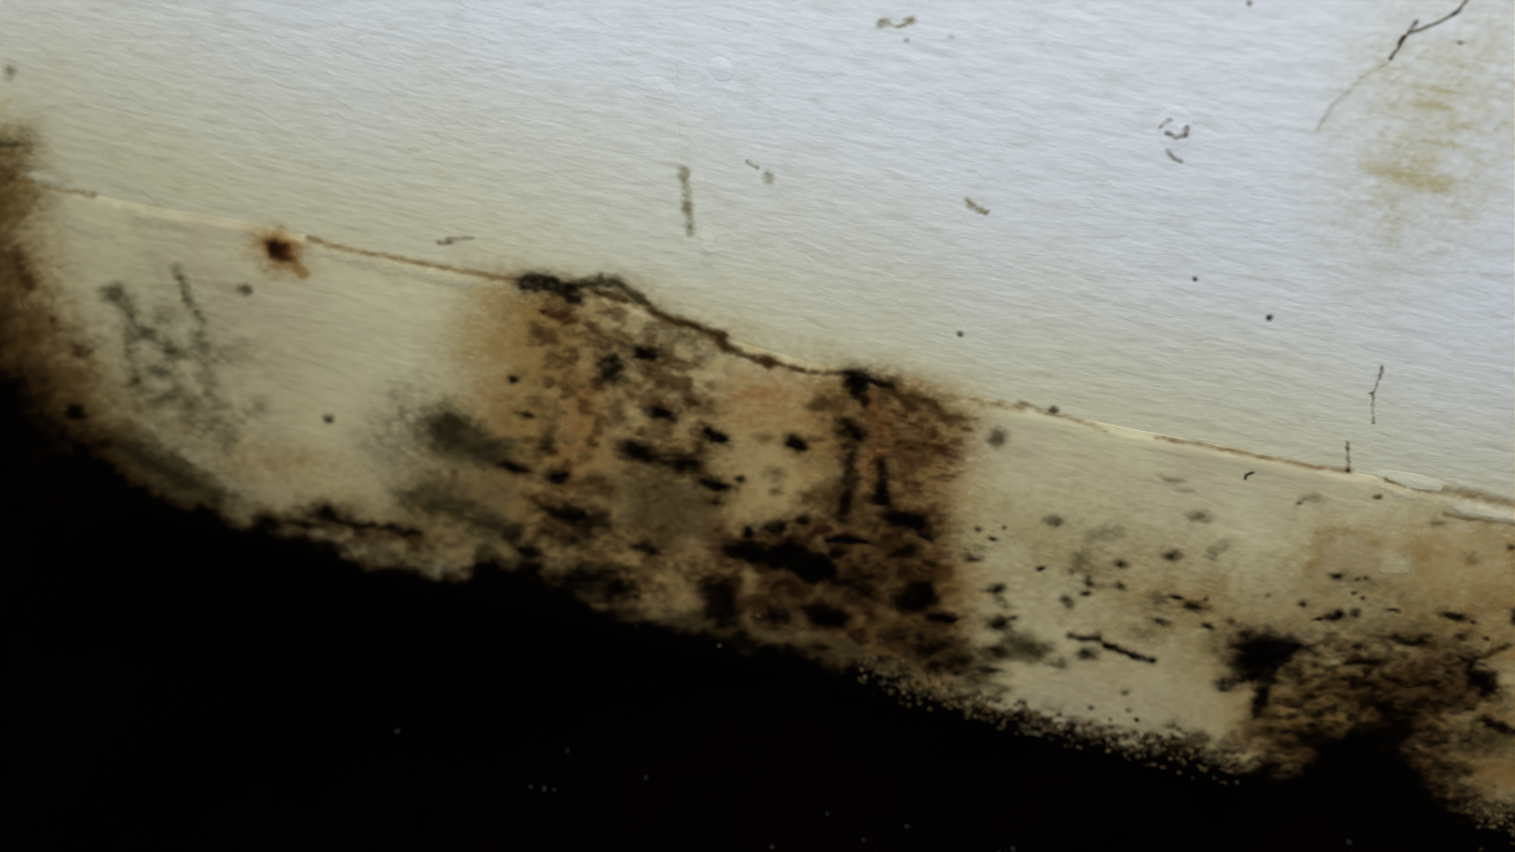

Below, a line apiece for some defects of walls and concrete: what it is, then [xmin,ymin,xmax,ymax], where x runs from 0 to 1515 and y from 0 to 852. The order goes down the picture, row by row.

damp [0,137,156,630]
corrosion [260,229,308,278]
damp [71,273,1515,852]